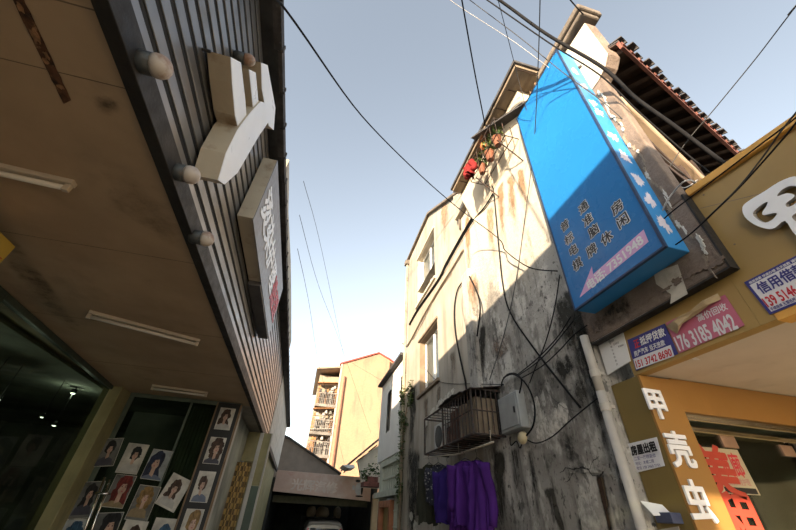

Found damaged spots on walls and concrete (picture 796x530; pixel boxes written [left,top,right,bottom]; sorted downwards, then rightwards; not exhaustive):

corrosion [13,0,71,104]
water stain [473,326,485,371]
water stain [494,449,520,519]
water stain [529,456,564,530]